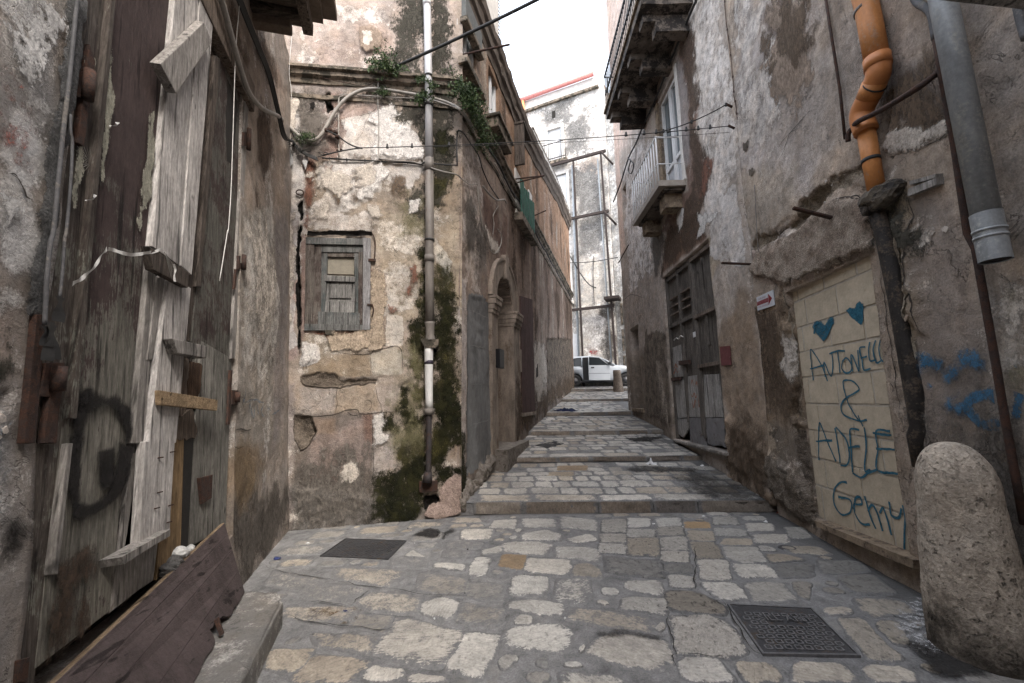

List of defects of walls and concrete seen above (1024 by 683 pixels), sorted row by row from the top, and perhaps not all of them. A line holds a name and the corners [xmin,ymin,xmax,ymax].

peeling [3,0,70,89]
peeling [290,93,334,137]
peeling [0,190,26,226]
peeling [244,103,424,337]
spalling [753,166,863,251]
spalling [300,344,377,388]
spalling [293,415,317,450]